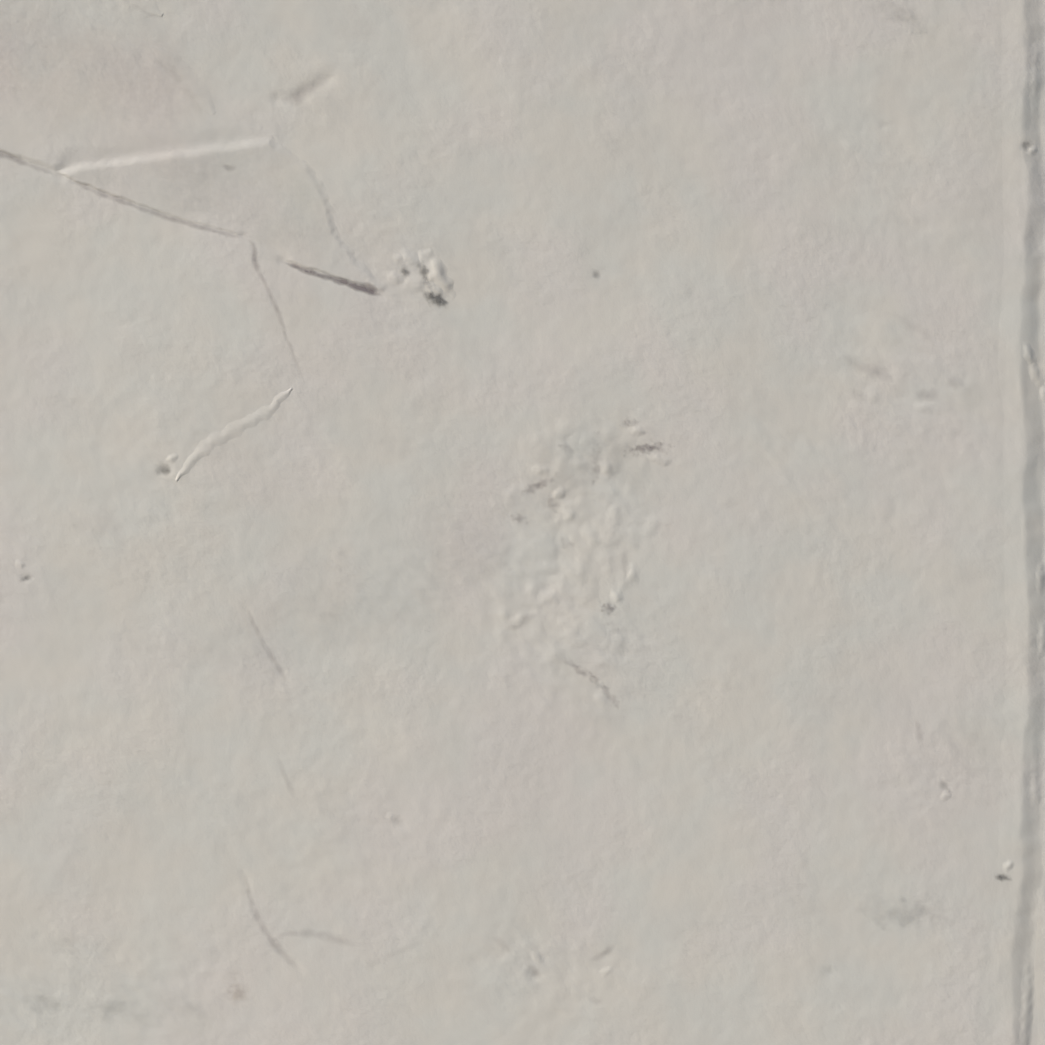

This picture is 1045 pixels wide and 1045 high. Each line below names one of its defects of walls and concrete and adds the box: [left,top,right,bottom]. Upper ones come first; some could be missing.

crack [295,266,374,294]